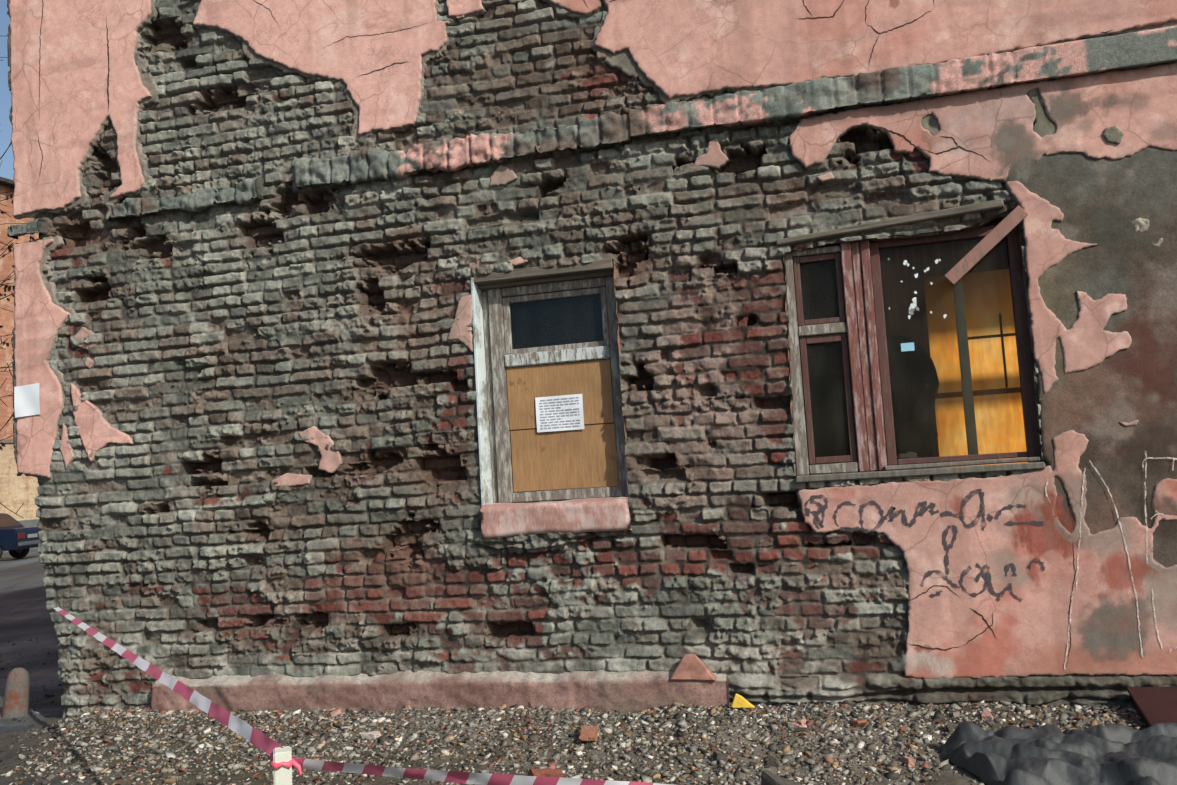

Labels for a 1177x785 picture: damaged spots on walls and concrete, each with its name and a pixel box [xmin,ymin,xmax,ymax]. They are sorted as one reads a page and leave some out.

crack [798,0,935,63]
spalling [119,0,664,204]
spalling [679,86,778,102]
spalling [878,96,937,106]
peeling [1027,79,1056,137]
water stain [994,124,1038,181]
spalling [34,104,1177,719]
crack [907,585,996,651]